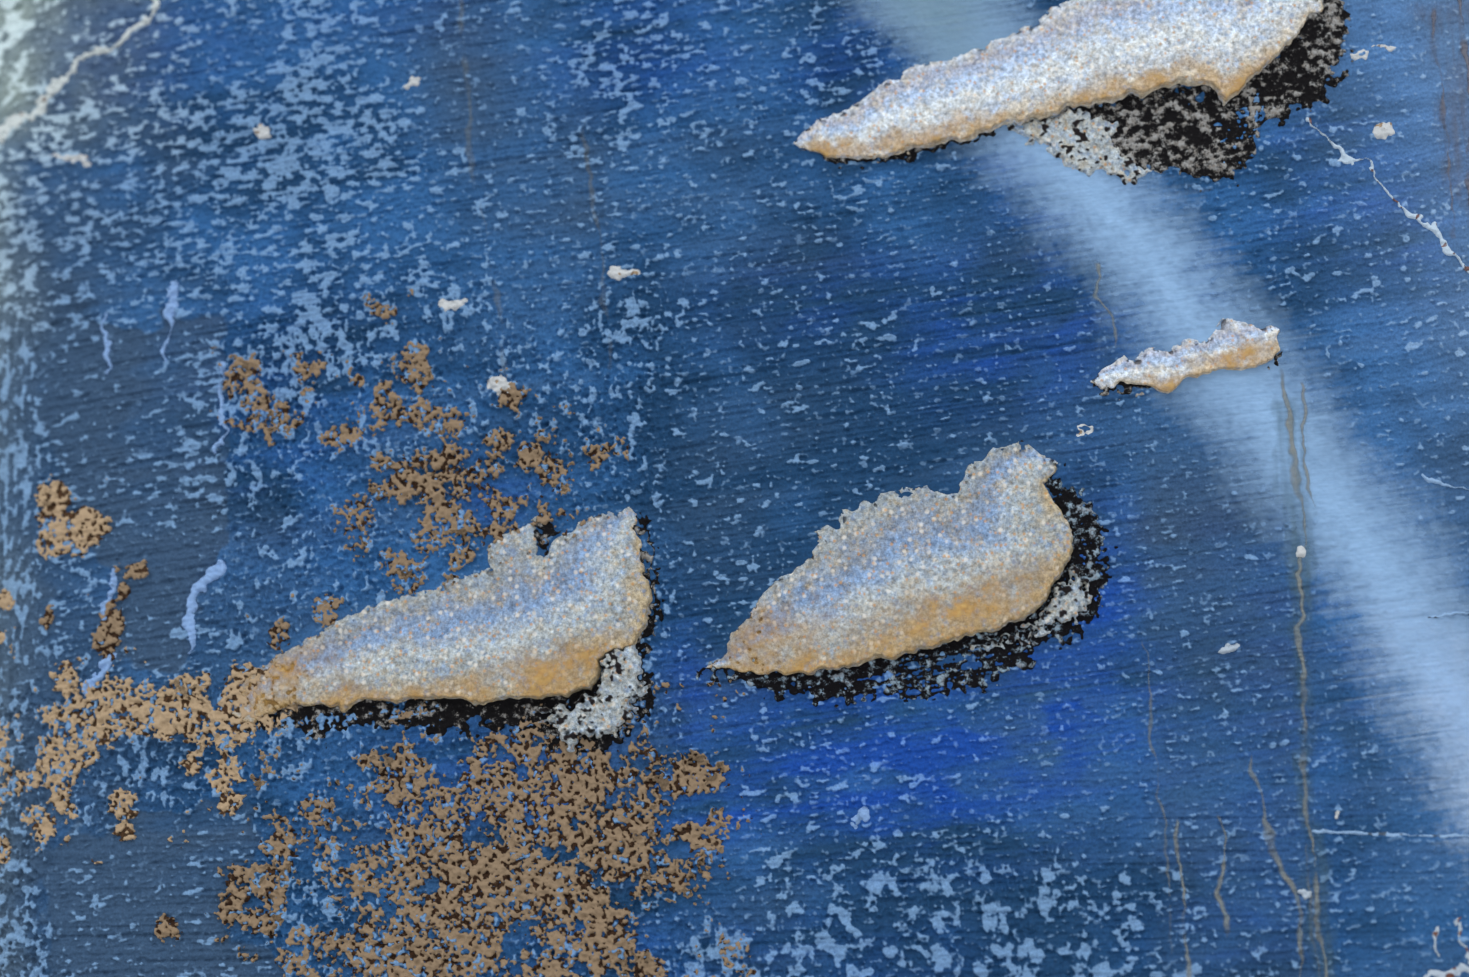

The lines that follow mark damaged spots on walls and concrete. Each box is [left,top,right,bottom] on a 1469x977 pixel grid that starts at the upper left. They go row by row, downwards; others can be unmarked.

crack [0,0,160,144]
spalling [794,0,1354,192]
crack [1306,117,1469,273]
peeling [362,289,413,325]
crack [1421,473,1469,490]
crack [1427,611,1469,619]
peeling [0,337,1118,977]
rust [526,651,597,696]
crack [1312,829,1469,838]
crack [1424,917,1469,977]